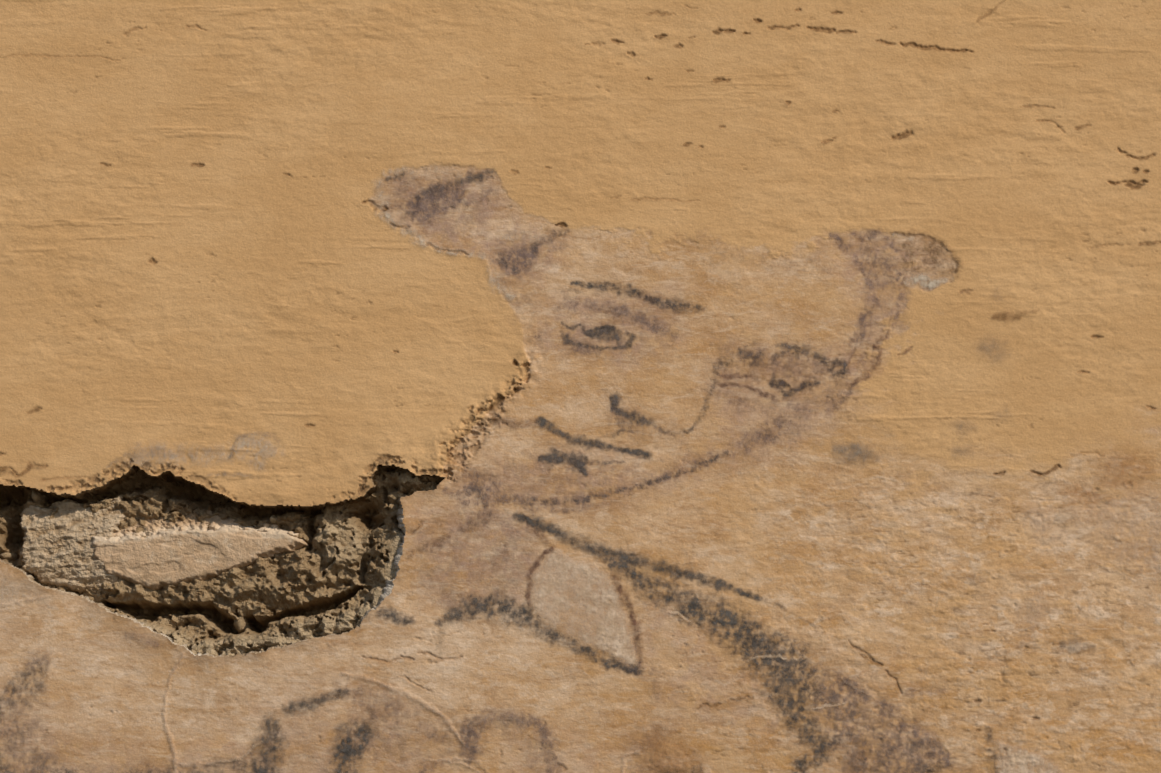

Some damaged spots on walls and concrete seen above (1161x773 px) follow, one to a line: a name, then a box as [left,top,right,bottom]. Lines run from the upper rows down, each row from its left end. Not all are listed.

flaking render [0,164,1161,773]